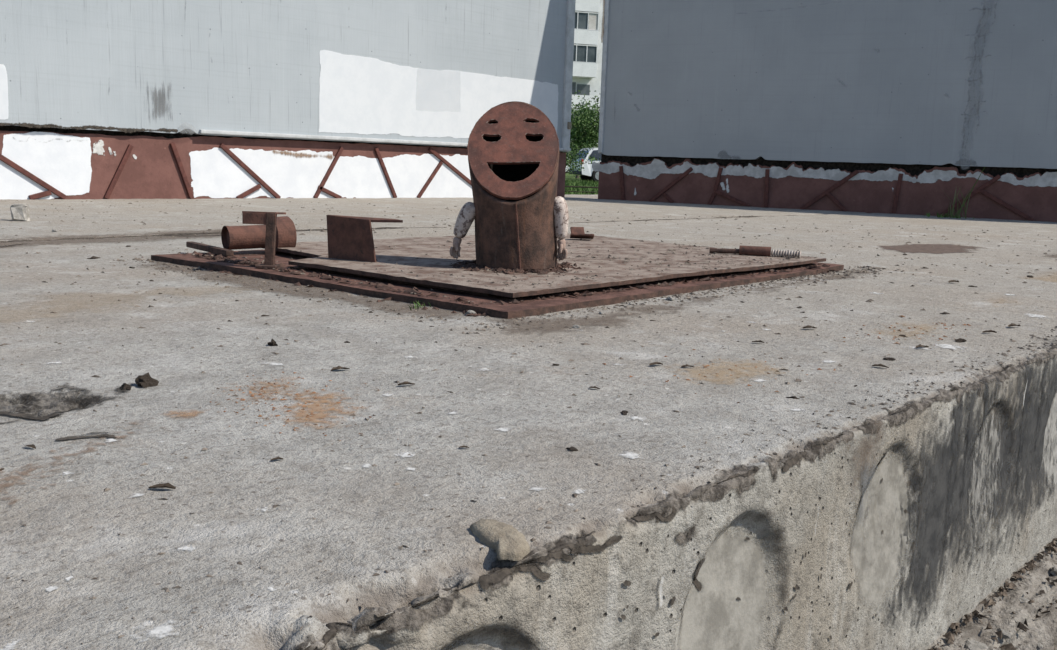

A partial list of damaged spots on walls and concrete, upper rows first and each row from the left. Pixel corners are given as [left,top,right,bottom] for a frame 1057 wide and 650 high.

leakage [154,90,166,115]
peeling [592,159,1057,195]
leakage [880,244,982,254]
spalling [0,383,132,420]
spalling [55,432,116,440]
spalling [626,343,1057,525]
leakage [887,343,1057,626]
spalling [676,524,697,545]
spalling [479,530,623,591]
spalling [294,580,472,650]